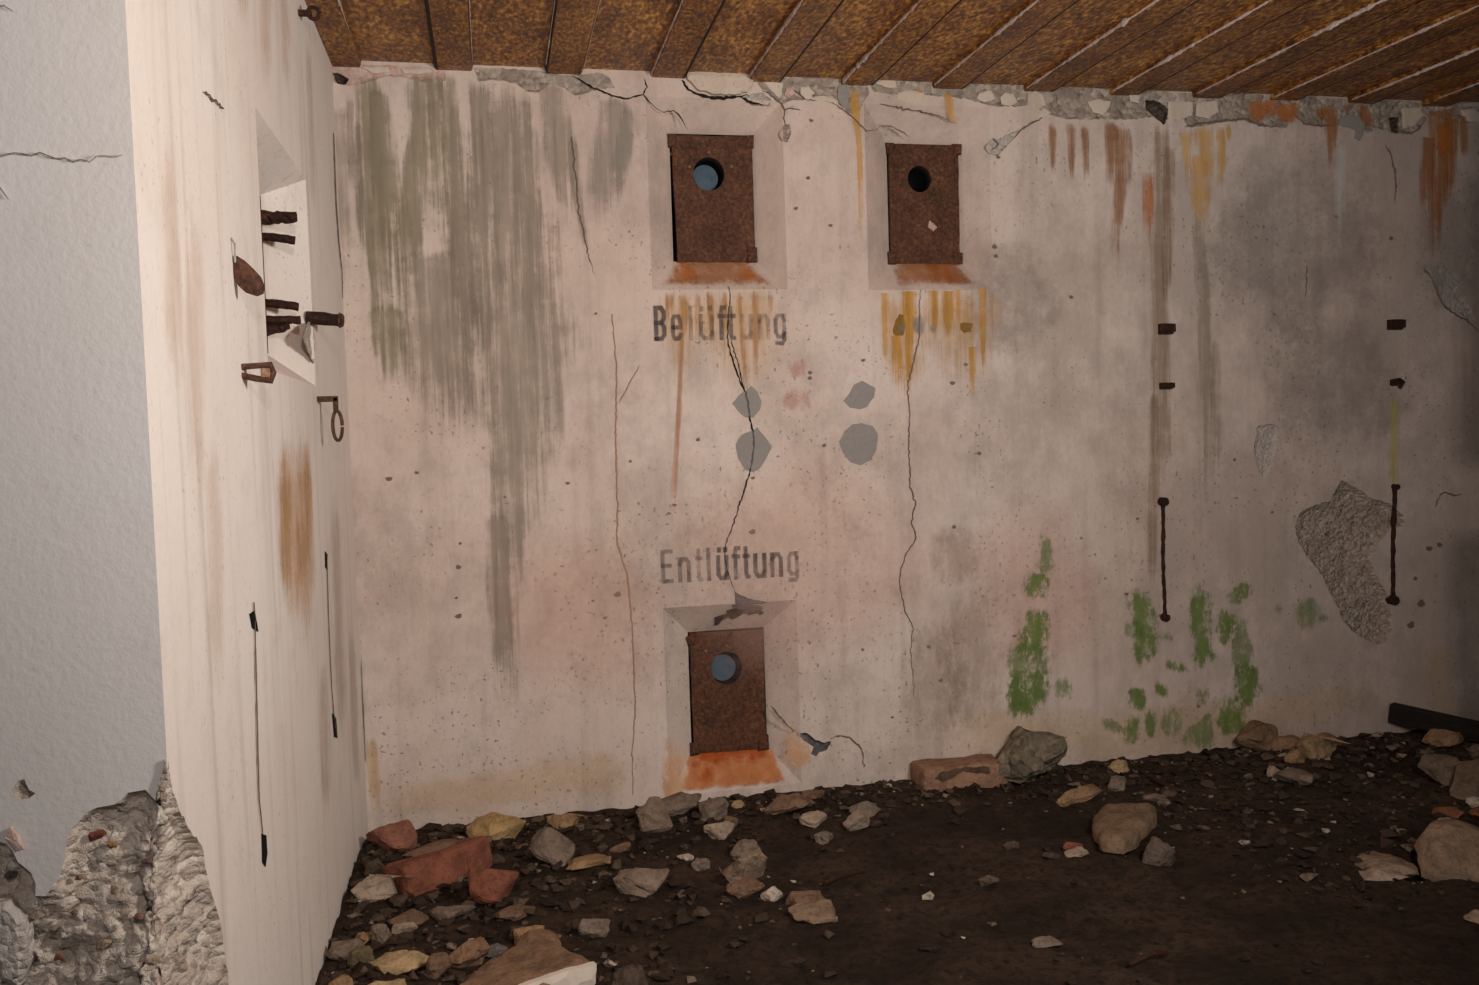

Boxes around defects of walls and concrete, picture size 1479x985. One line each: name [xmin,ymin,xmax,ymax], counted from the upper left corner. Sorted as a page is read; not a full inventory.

spalling [474,67,615,95]
rust [1049,128,1087,169]
spalling [686,72,1479,134]
leakage [357,77,632,659]
rust [667,262,761,346]
rust [882,263,986,383]
crack [725,286,755,591]
crack [899,291,921,692]
spalling [1295,480,1425,645]
rust [664,736,808,797]
crack [831,735,864,764]
spalling [0,759,229,985]